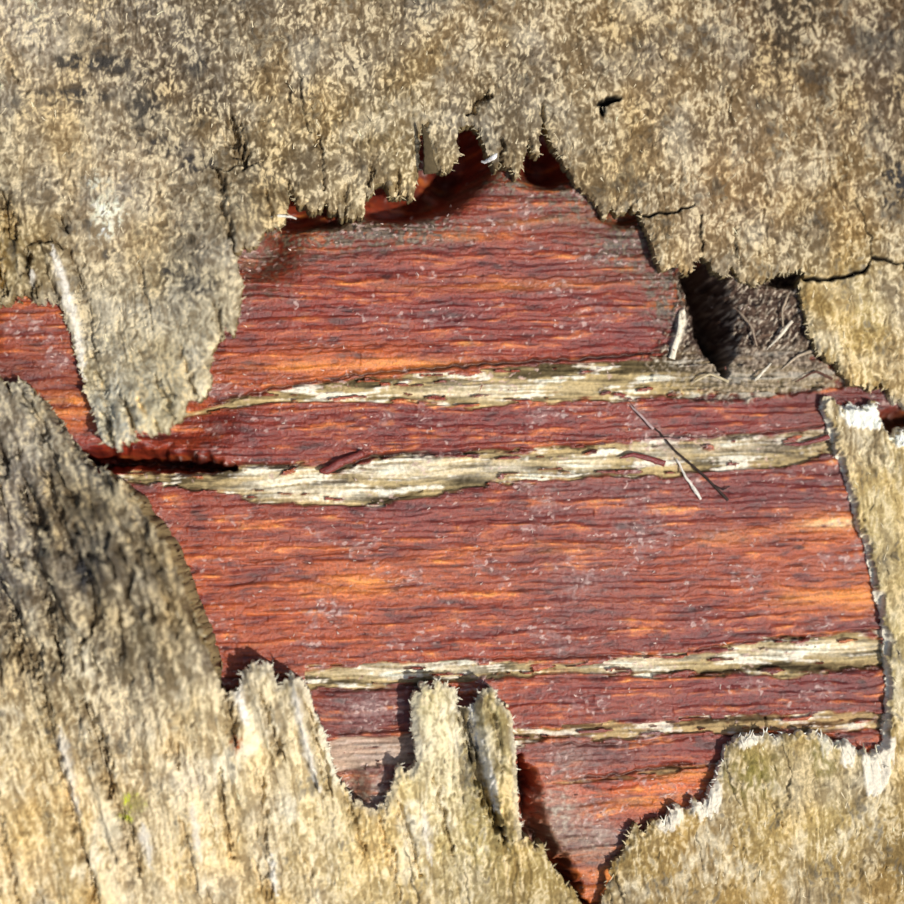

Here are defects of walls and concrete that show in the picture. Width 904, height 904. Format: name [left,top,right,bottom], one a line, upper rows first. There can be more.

peeling [0,130,904,508]
crack [642,204,695,218]
crack [803,256,904,282]
peeling [130,430,886,904]